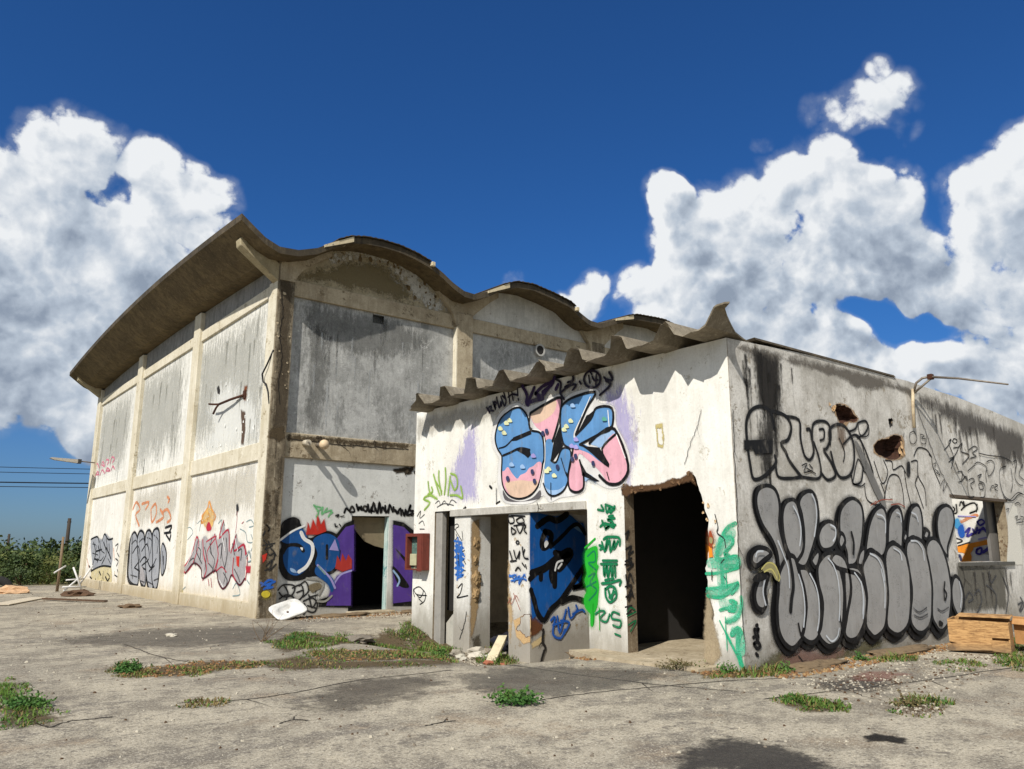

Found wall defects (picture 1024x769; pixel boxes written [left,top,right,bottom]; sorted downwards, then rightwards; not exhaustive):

leakage [273,261,409,514]
spalling [829,402,859,445]
leakage [739,346,1024,485]
spalling [873,418,905,461]
spalling [621,471,696,496]